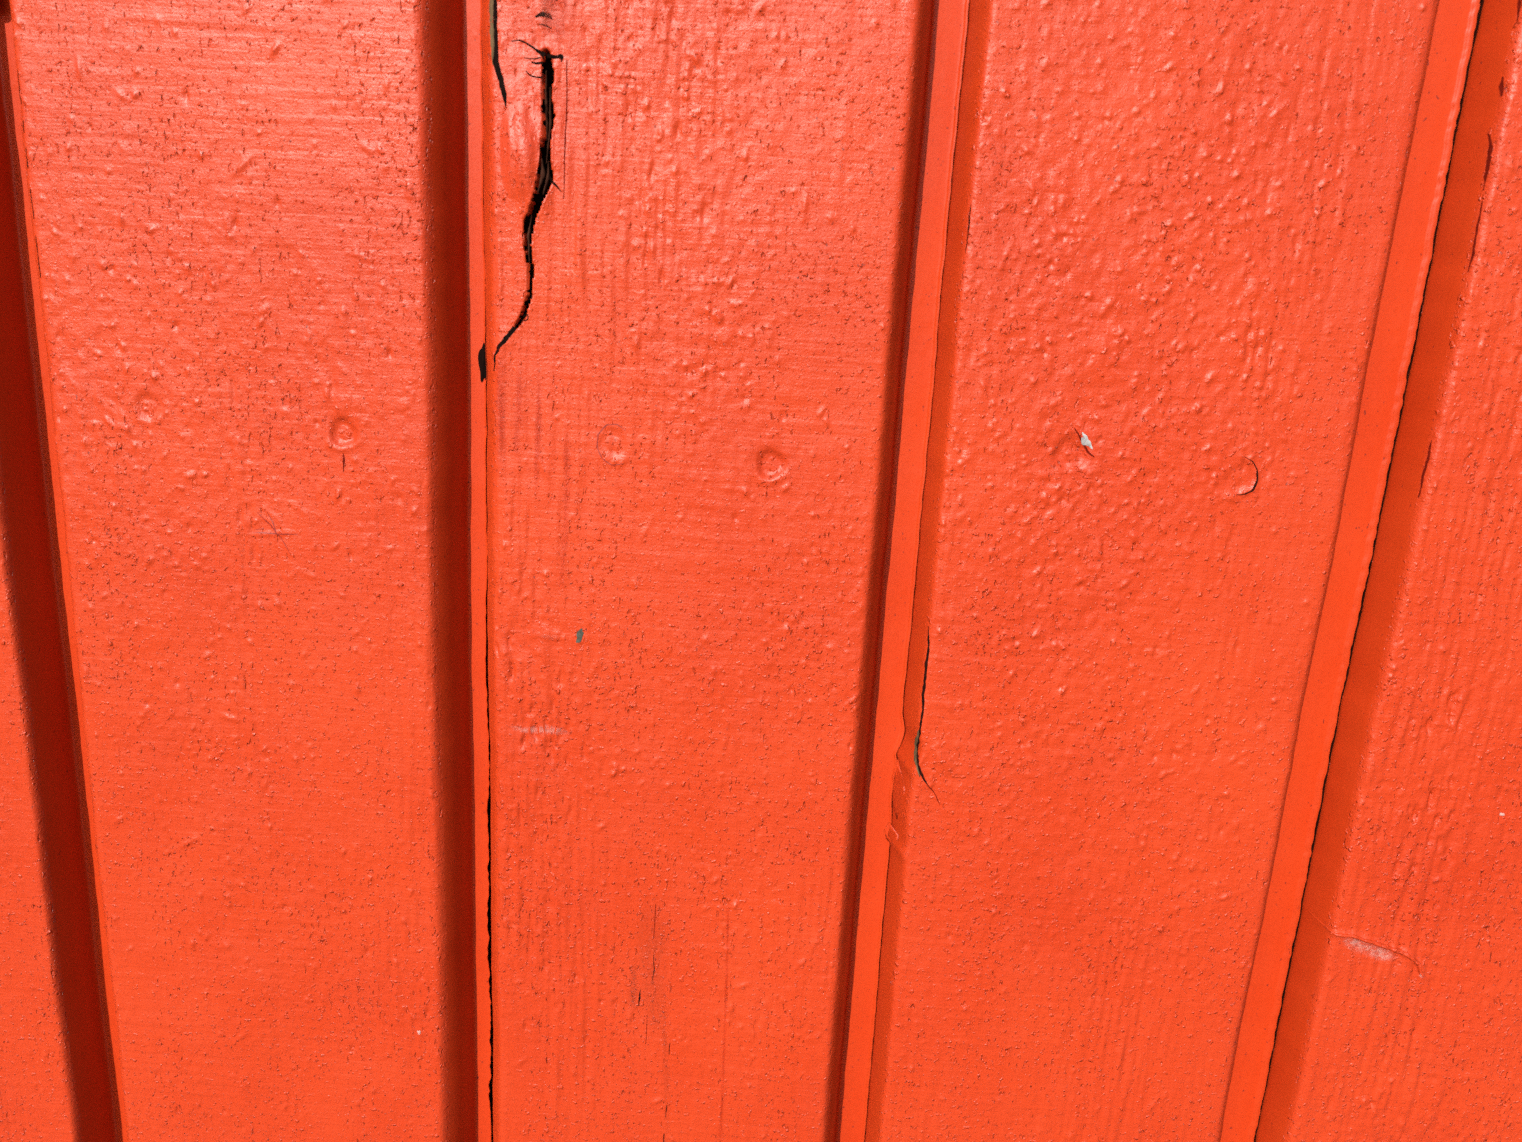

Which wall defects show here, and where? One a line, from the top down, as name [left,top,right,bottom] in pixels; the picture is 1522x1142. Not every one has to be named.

crack [481,0,567,370]
crack [914,626,940,805]